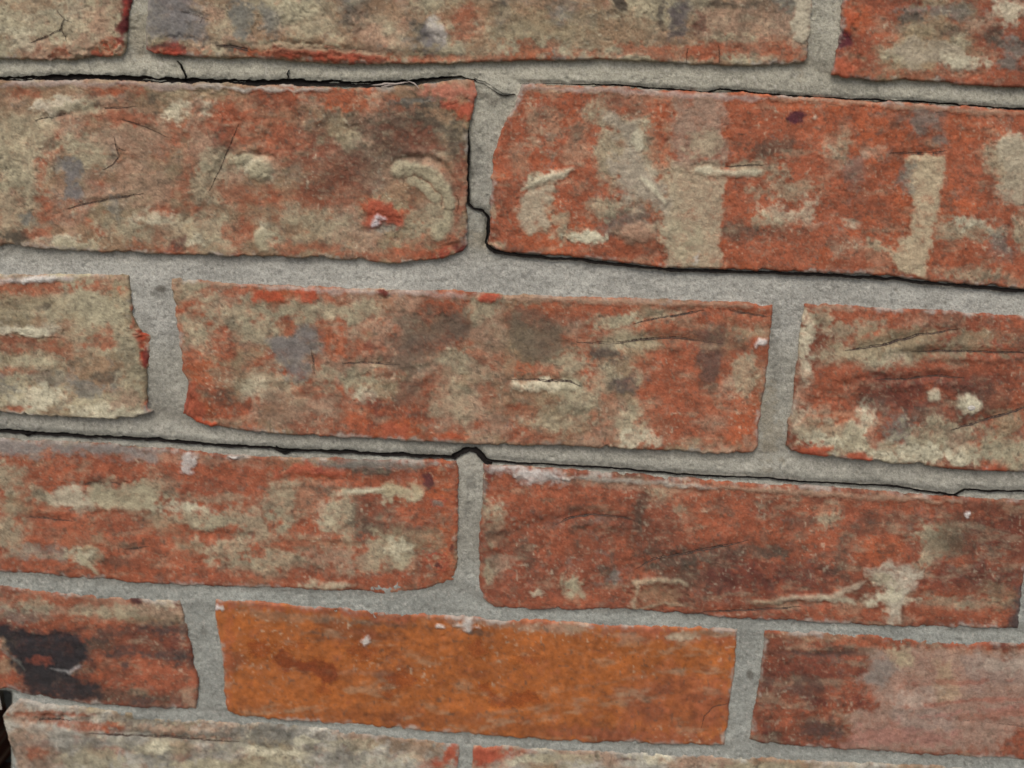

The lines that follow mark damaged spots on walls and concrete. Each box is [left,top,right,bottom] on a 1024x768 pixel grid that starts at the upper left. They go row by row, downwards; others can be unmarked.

crack [0,61,1024,110]
crack [103,119,166,170]
crack [467,128,517,256]
crack [0,428,1024,496]